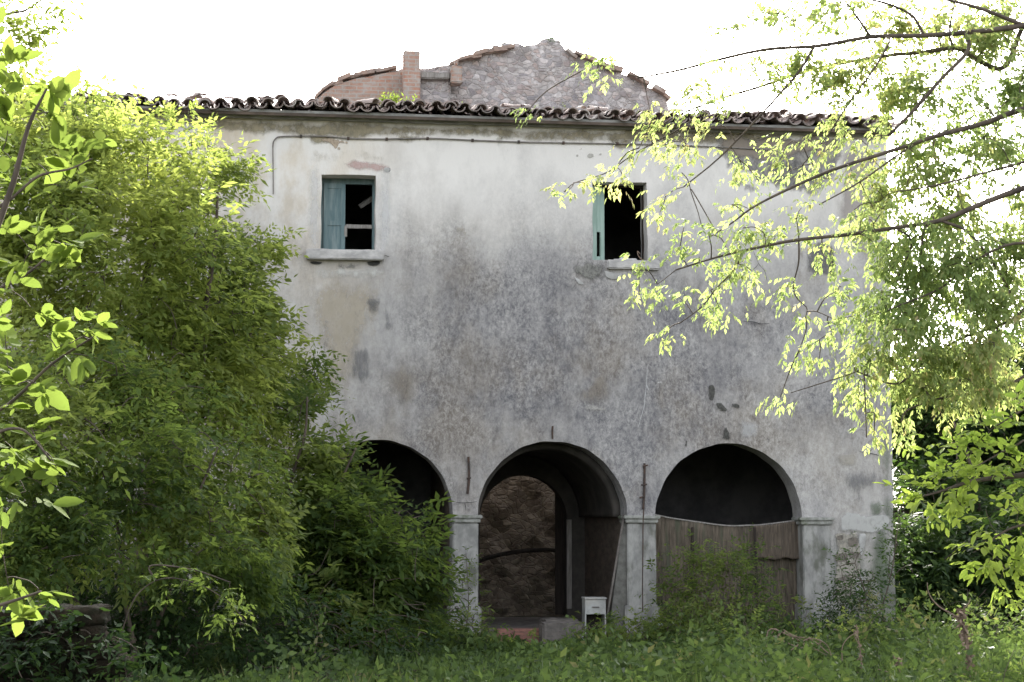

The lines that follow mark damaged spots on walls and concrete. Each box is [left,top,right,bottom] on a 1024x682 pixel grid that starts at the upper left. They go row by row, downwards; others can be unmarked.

flaking render [348,161,390,173]
leakage [317,288,378,383]
flaking render [709,385,739,411]